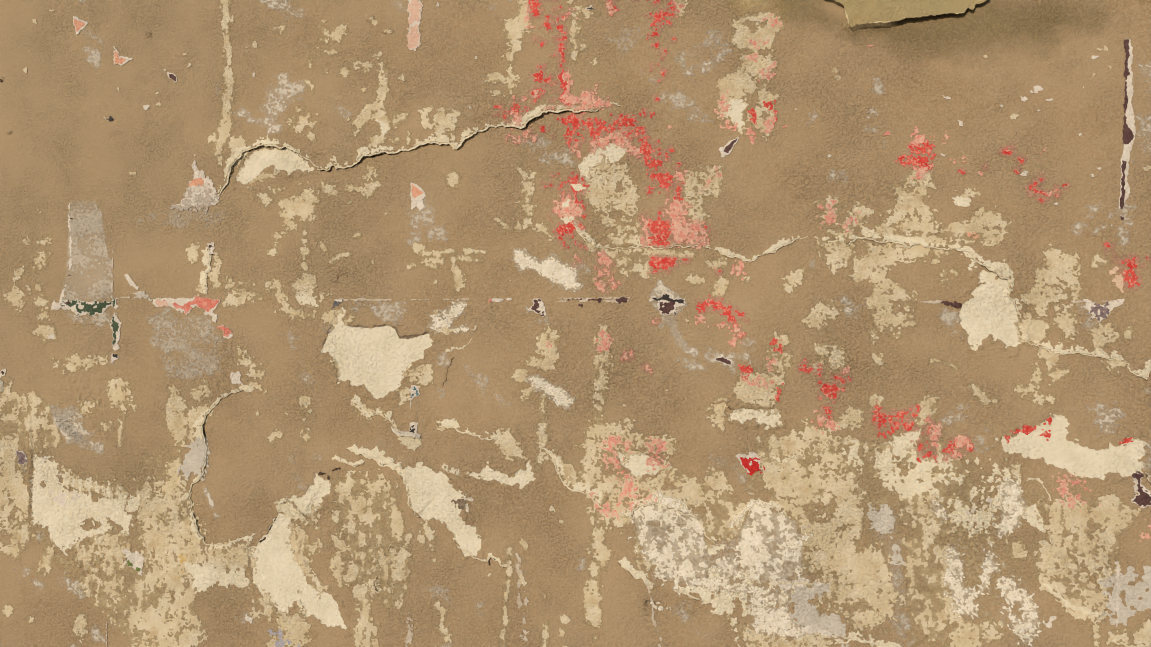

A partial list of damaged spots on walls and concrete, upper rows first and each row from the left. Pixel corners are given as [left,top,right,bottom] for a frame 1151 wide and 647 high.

peeling [302,19,382,92]
peeling [646,0,690,81]
peeling [283,103,318,142]
peeling [347,88,472,150]
peeling [1021,85,1053,111]
peeling [444,171,460,188]
peeling [493,97,753,303]
peeling [185,241,200,264]
peeling [204,134,436,425]
peeling [0,377,482,647]